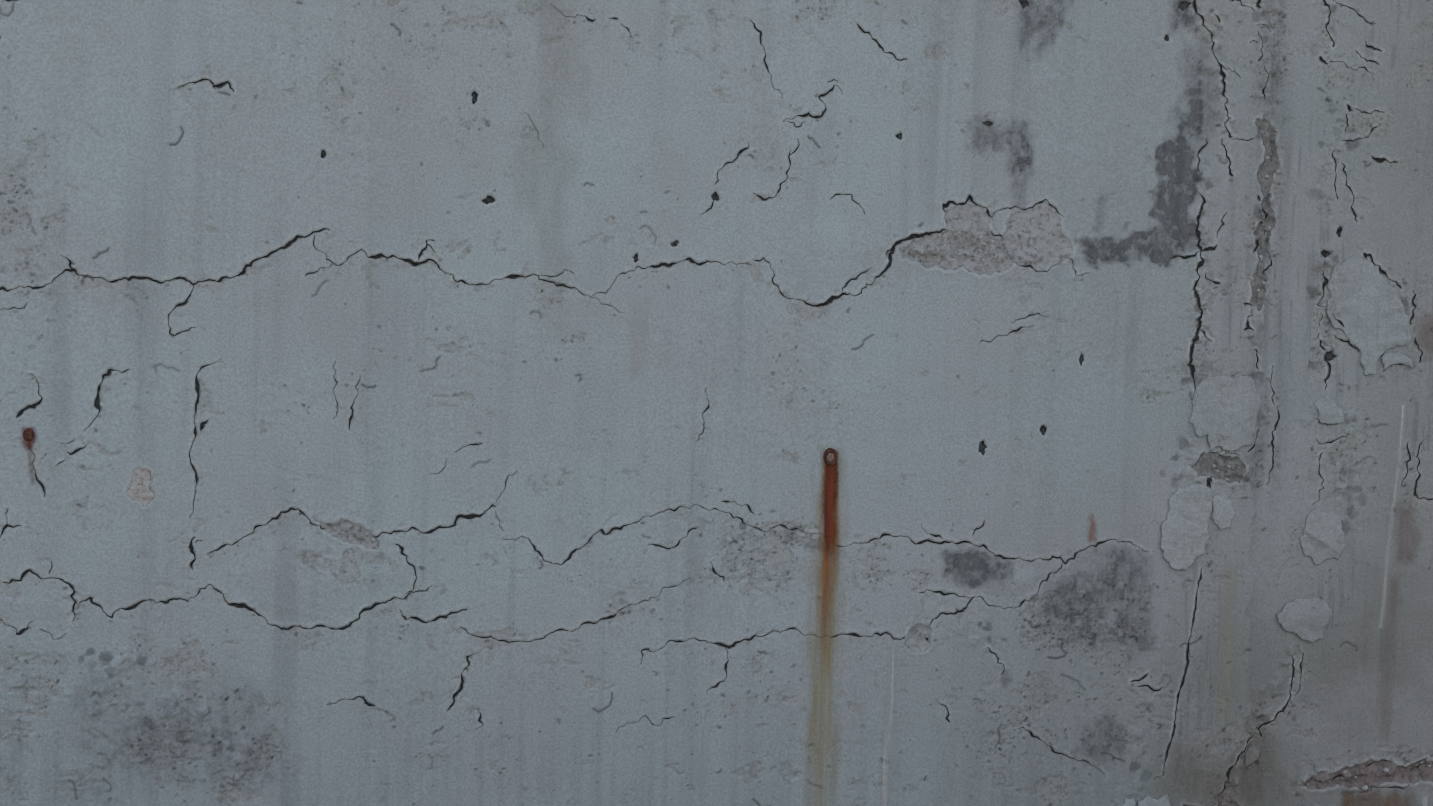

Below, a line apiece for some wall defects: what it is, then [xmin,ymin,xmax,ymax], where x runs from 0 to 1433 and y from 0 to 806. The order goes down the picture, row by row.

crack [179,78,234,92]
crack [0,195,1089,336]
crack [750,19,842,200]
crack [857,24,903,61]
spalling [899,228,1012,275]
leakage [1082,67,1203,266]
crack [1170,0,1280,482]
crack [0,361,1145,728]
corrosion [814,462,838,737]
crack [1131,568,1202,780]
peeling [1121,794,1171,806]
spalling [1302,759,1433,793]